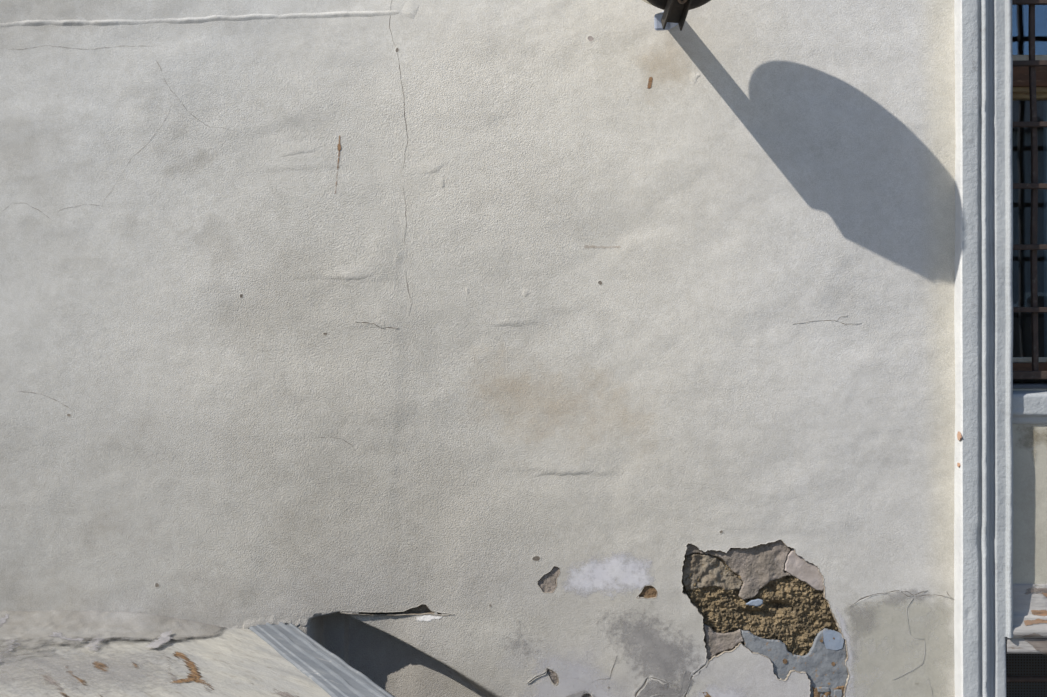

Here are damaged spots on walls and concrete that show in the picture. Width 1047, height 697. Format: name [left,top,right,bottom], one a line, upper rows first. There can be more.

crack [388,0,408,244]
peeling [537,566,560,593]
water stain [564,554,652,597]
peeling [636,585,658,599]
spalling [681,539,850,697]
peeling [1022,610,1047,654]
peeling [546,668,559,686]